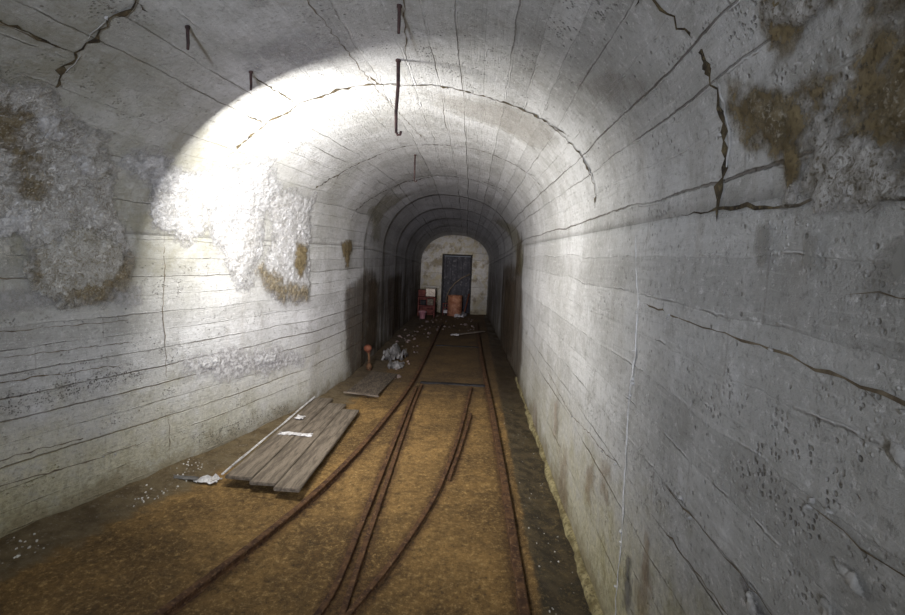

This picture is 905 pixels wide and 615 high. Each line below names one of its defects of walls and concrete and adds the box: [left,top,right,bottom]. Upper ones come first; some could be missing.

crack [0,0,147,88]
spalling [764,0,824,26]
water stain [0,79,317,309]
crack [230,0,596,206]
crack [636,0,813,220]
spalling [782,99,905,213]
crack [866,196,905,213]
crack [0,317,132,383]
crack [162,234,173,365]
crack [0,438,147,487]
crack [552,237,905,615]